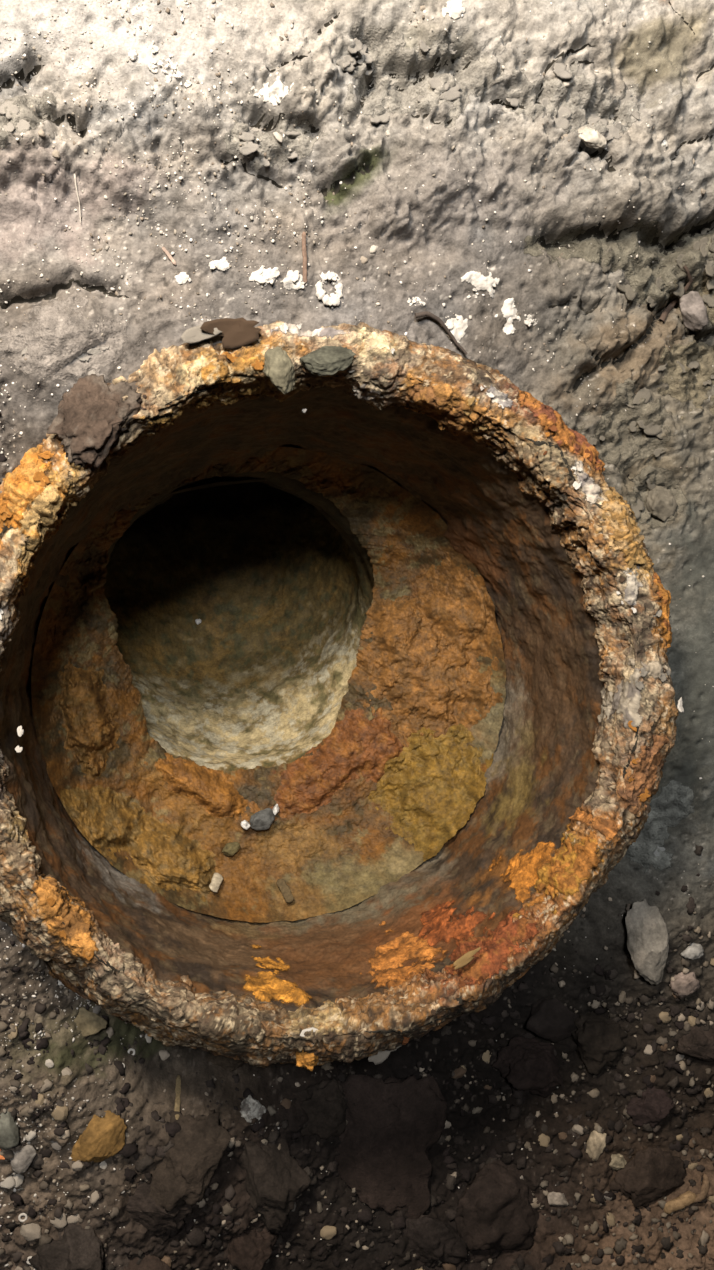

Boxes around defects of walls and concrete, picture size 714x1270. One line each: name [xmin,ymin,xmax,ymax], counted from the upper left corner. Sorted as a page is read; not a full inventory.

water stain [175,272,189,285]
water stain [208,257,230,271]
efflorescence [249,265,343,306]
efflorescence [445,314,468,343]
efflorescence [461,267,538,334]
corrosion [139,317,276,438]
corrosion [404,373,488,443]
corrosion [0,445,86,596]
corrosion [144,552,503,821]
corrosion [359,735,669,1016]
corrosion [27,874,99,961]
corrosion [243,944,312,1006]